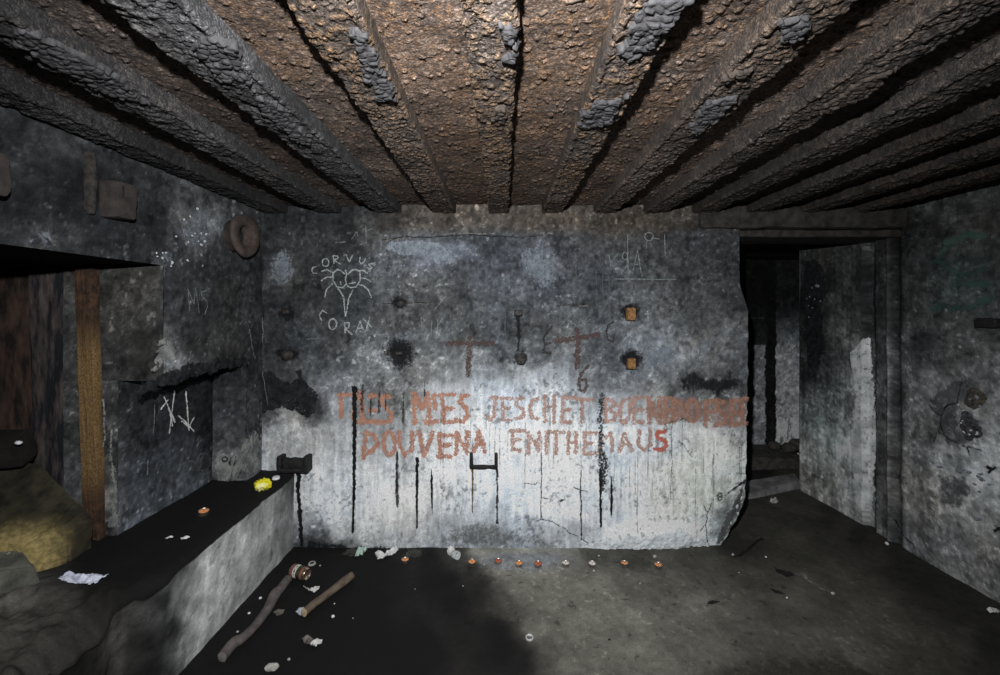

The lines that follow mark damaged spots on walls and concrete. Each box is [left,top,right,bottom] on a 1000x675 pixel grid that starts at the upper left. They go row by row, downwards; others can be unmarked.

spalling [136,337,248,395]
spalling [959,388,987,441]